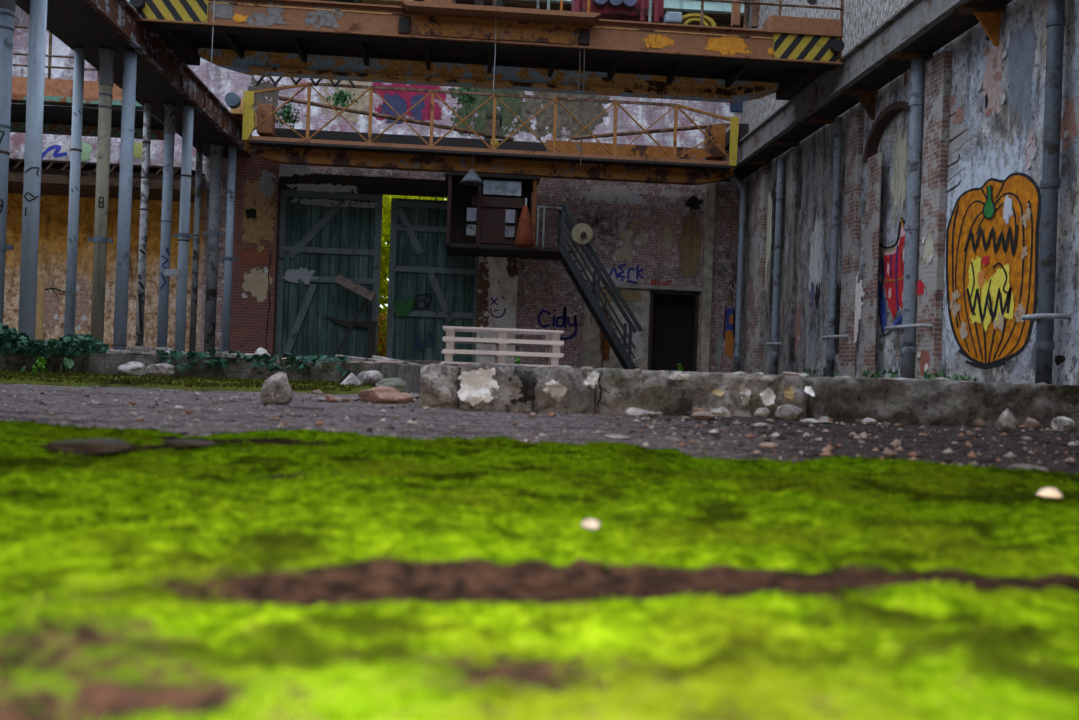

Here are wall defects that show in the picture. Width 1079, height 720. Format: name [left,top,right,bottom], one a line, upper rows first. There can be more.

corrosion [233,13,249,23]
corrosion [640,34,674,49]
corrosion [705,36,752,55]
flaking render [242,164,380,252]
flaking render [922,233,934,267]
flaking render [241,267,318,303]
flaking render [854,271,865,345]
flaking render [917,350,930,376]